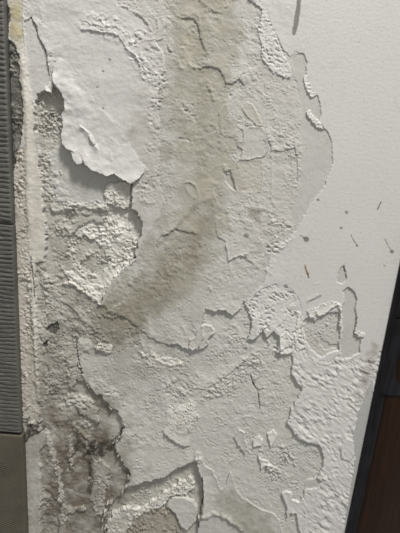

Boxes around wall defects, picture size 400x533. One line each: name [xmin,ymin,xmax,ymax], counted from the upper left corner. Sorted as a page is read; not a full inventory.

peeling [24,0,365,399]
water stain [169,0,242,208]
water stain [73,428,122,494]
peeling [37,301,323,533]